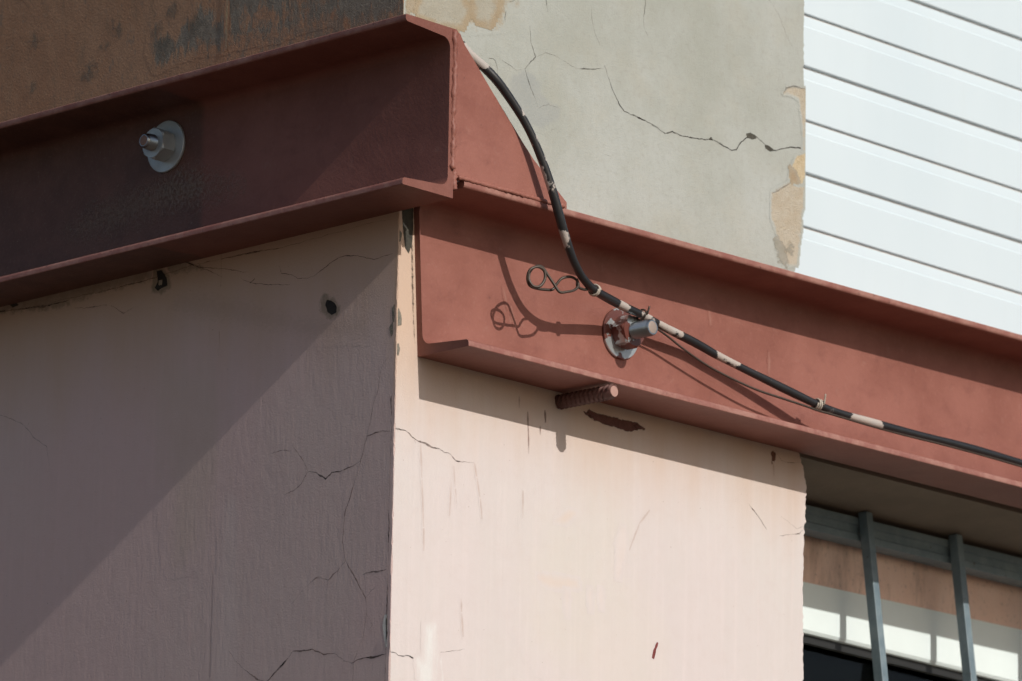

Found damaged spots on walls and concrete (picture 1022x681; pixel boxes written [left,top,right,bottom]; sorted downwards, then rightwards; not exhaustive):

flaking render [405,0,523,37]
crack [583,68,801,151]
spalling [770,83,806,269]
crack [247,388,460,680]